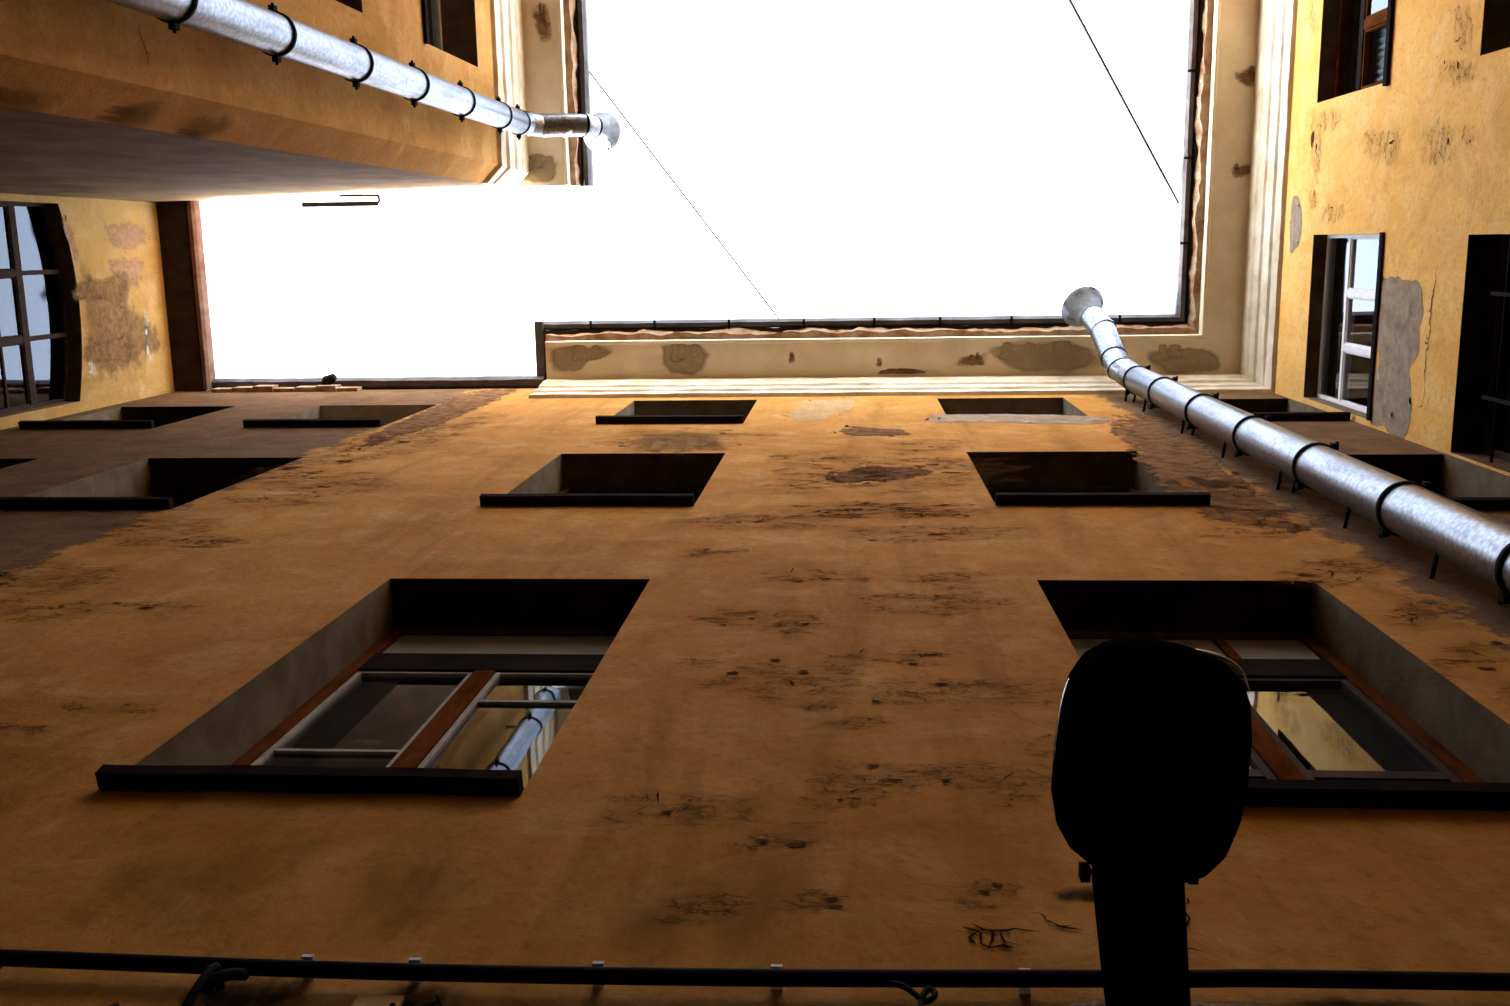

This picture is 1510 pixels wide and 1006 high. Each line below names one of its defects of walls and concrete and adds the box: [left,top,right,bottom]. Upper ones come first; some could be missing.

flaking render [103,222,152,293]
flaking render [1290,195,1340,253]
flaking render [1371,276,1423,439]